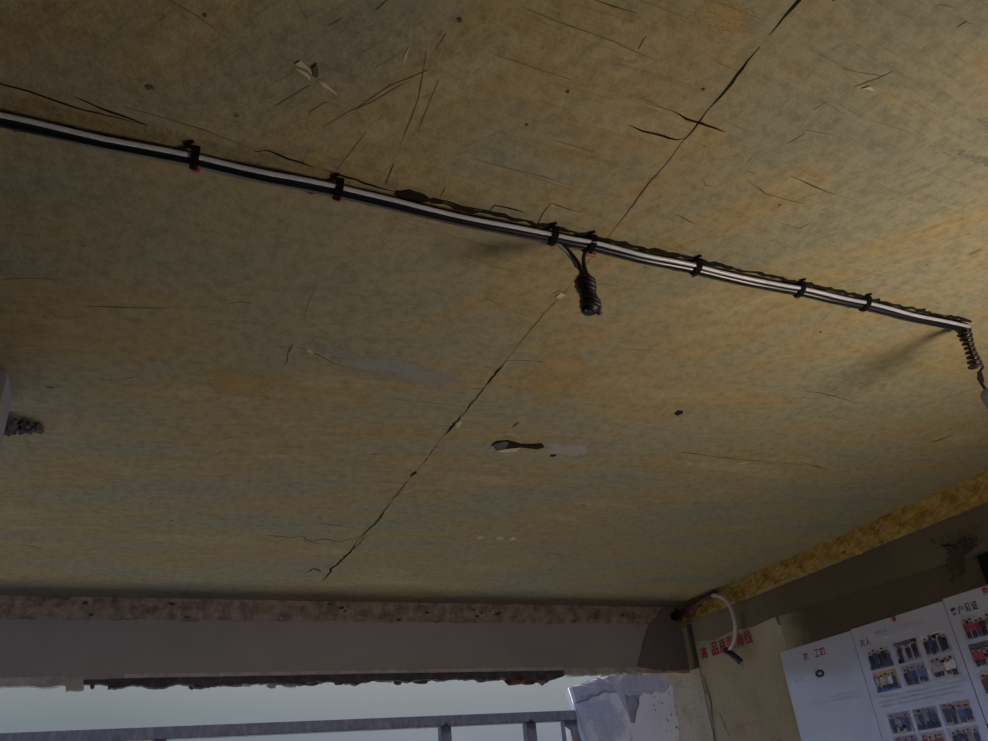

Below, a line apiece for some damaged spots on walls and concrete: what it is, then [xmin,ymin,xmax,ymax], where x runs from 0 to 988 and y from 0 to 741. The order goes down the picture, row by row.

crack [607,0,801,238]
crack [748,176,832,229]
spalling [4,412,45,437]
crack [268,259,591,581]
spalling [0,595,659,625]